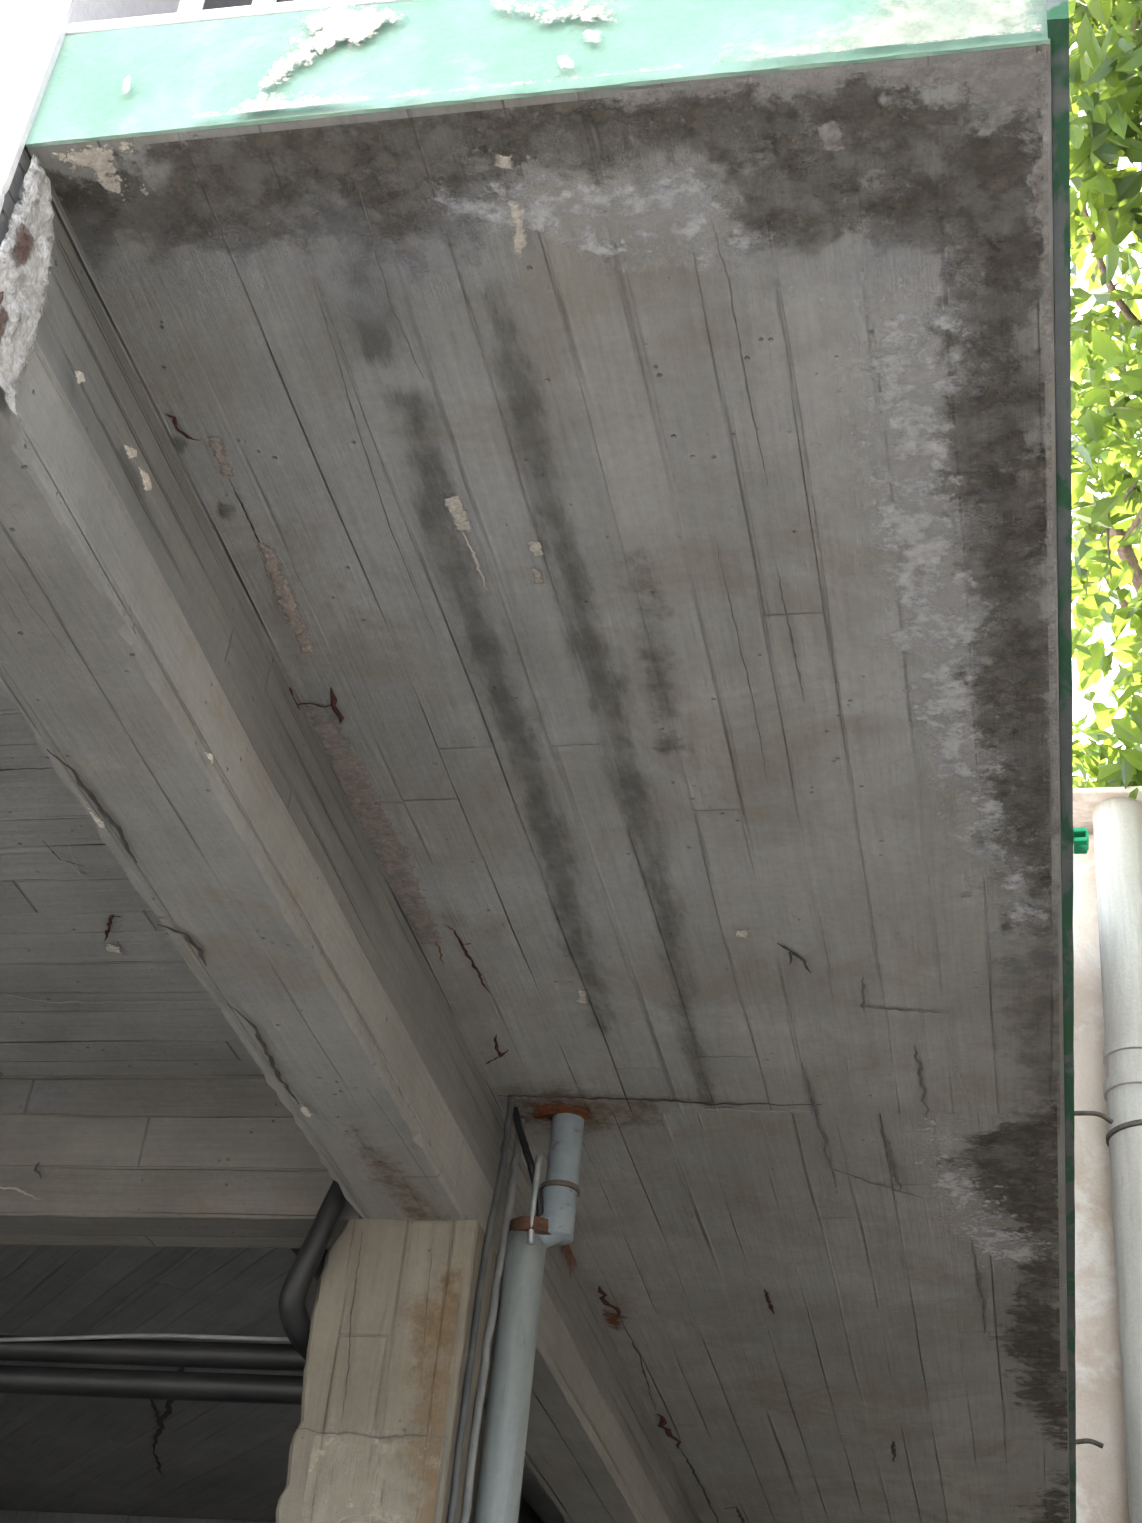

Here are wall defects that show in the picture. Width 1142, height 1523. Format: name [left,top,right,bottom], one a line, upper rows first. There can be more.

spalling [0,141,148,417]
spalling [124,444,152,491]
damp [46,72,1053,935]
crack [433,924,490,994]
crack [777,943,811,973]
rust [523,1092,647,1129]
crack [486,1034,932,1201]
crack [860,976,975,1119]
damp [900,1100,1068,1451]
crack [150,1367,184,1475]
crack [598,1286,745,1523]
damp [1020,1474,1069,1523]